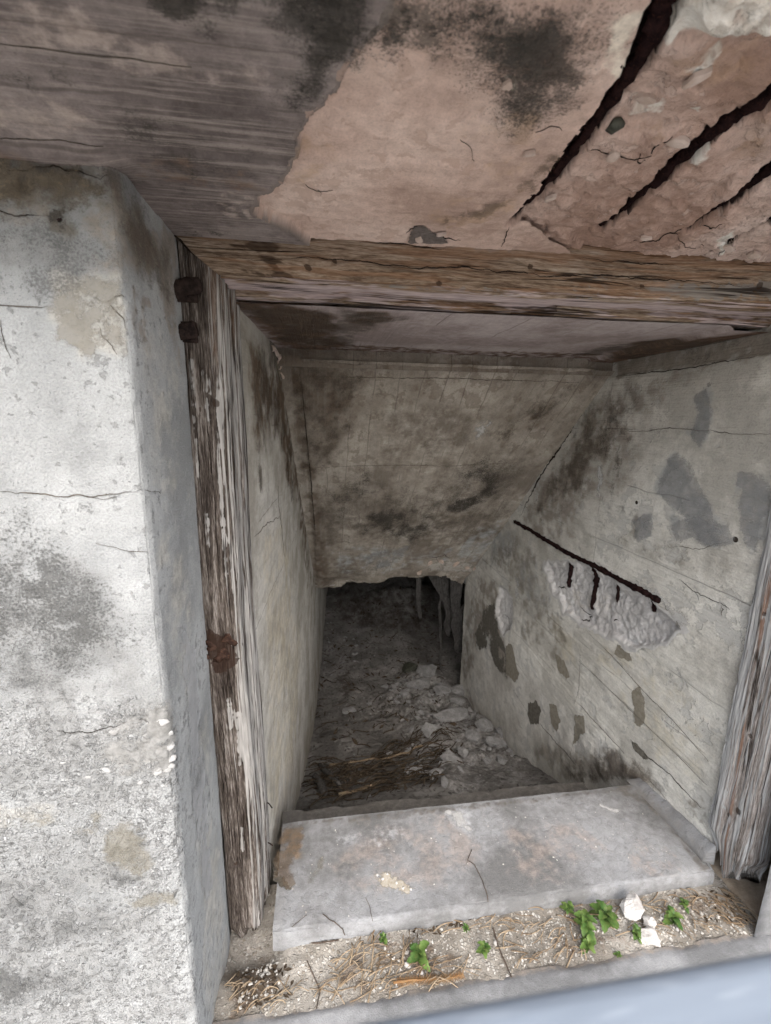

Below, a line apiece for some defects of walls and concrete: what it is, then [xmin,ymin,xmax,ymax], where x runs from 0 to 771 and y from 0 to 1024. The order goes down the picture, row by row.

water stain [283,0,597,137]
flaking render [249,0,771,263]
crack [587,137,672,164]
crack [634,217,734,256]
water stain [240,305,389,467]
crack [0,489,161,500]
water stain [364,459,511,545]
water stain [0,507,136,674]
spalling [513,520,690,661]